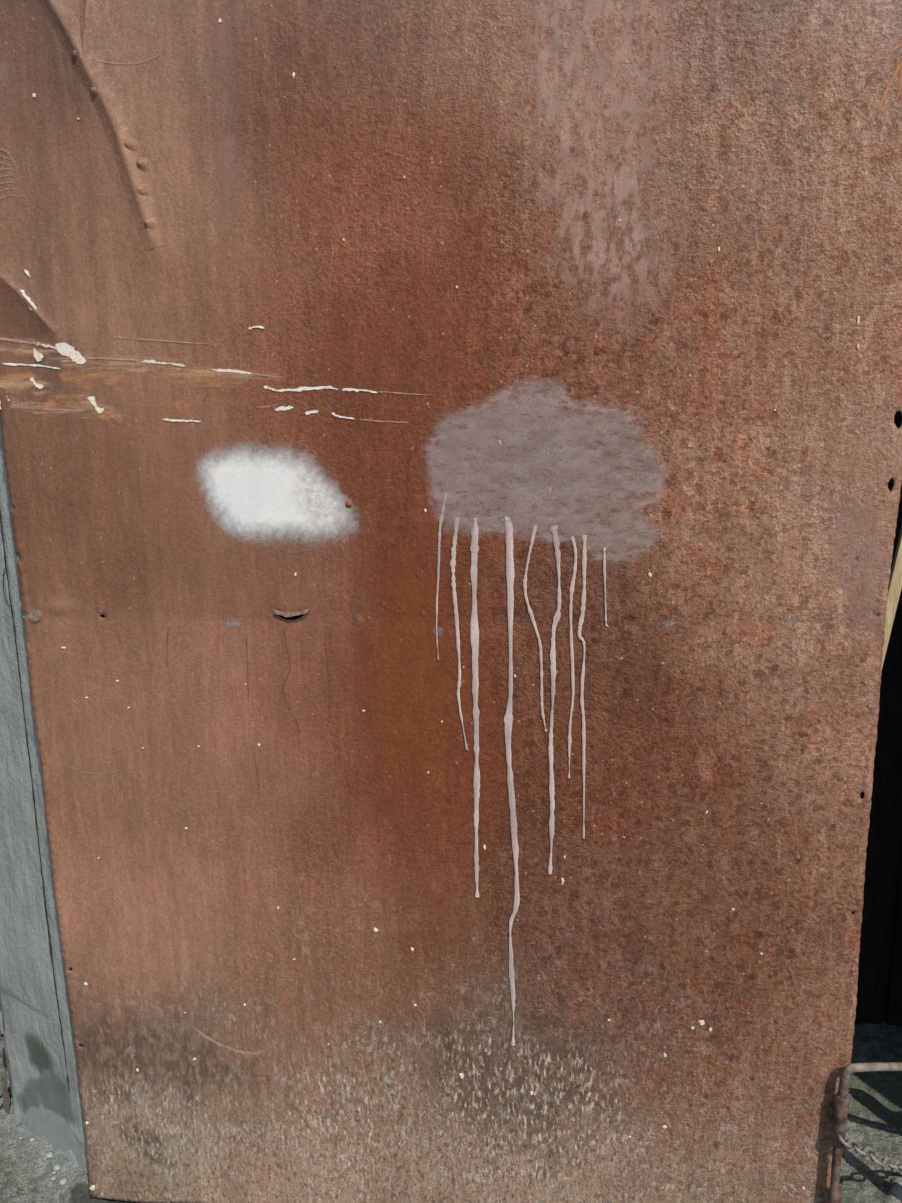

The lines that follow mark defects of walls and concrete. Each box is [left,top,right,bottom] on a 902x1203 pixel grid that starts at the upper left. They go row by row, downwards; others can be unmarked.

peeling [55,343,86,364]
leakage [93,1085,234,1163]
efflorescence [273,1064,406,1199]
efflorescence [434,1034,623,1201]